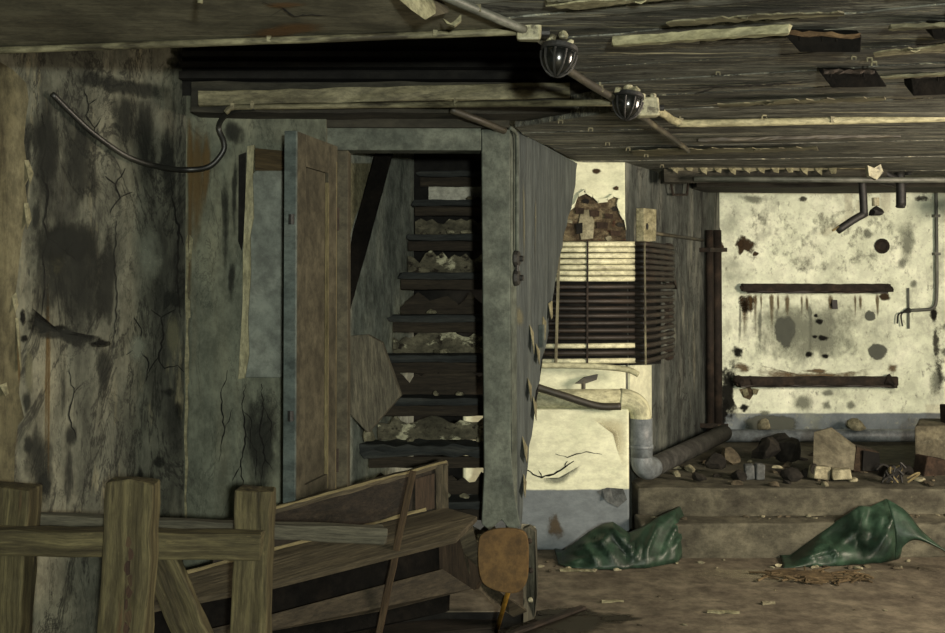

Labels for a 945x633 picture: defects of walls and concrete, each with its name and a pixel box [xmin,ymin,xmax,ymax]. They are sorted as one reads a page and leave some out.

leakage [24,111,97,198]
leakage [84,73,175,211]
spalling [563,189,626,241]
leakage [25,433,51,496]
leakage [20,205,115,394]
crack [105,168,184,382]
crack [219,370,273,483]
leakage [722,347,796,429]
corrosion [739,295,789,322]
leakage [797,396,809,408]
leakage [759,307,851,356]
leakage [930,308,945,389]